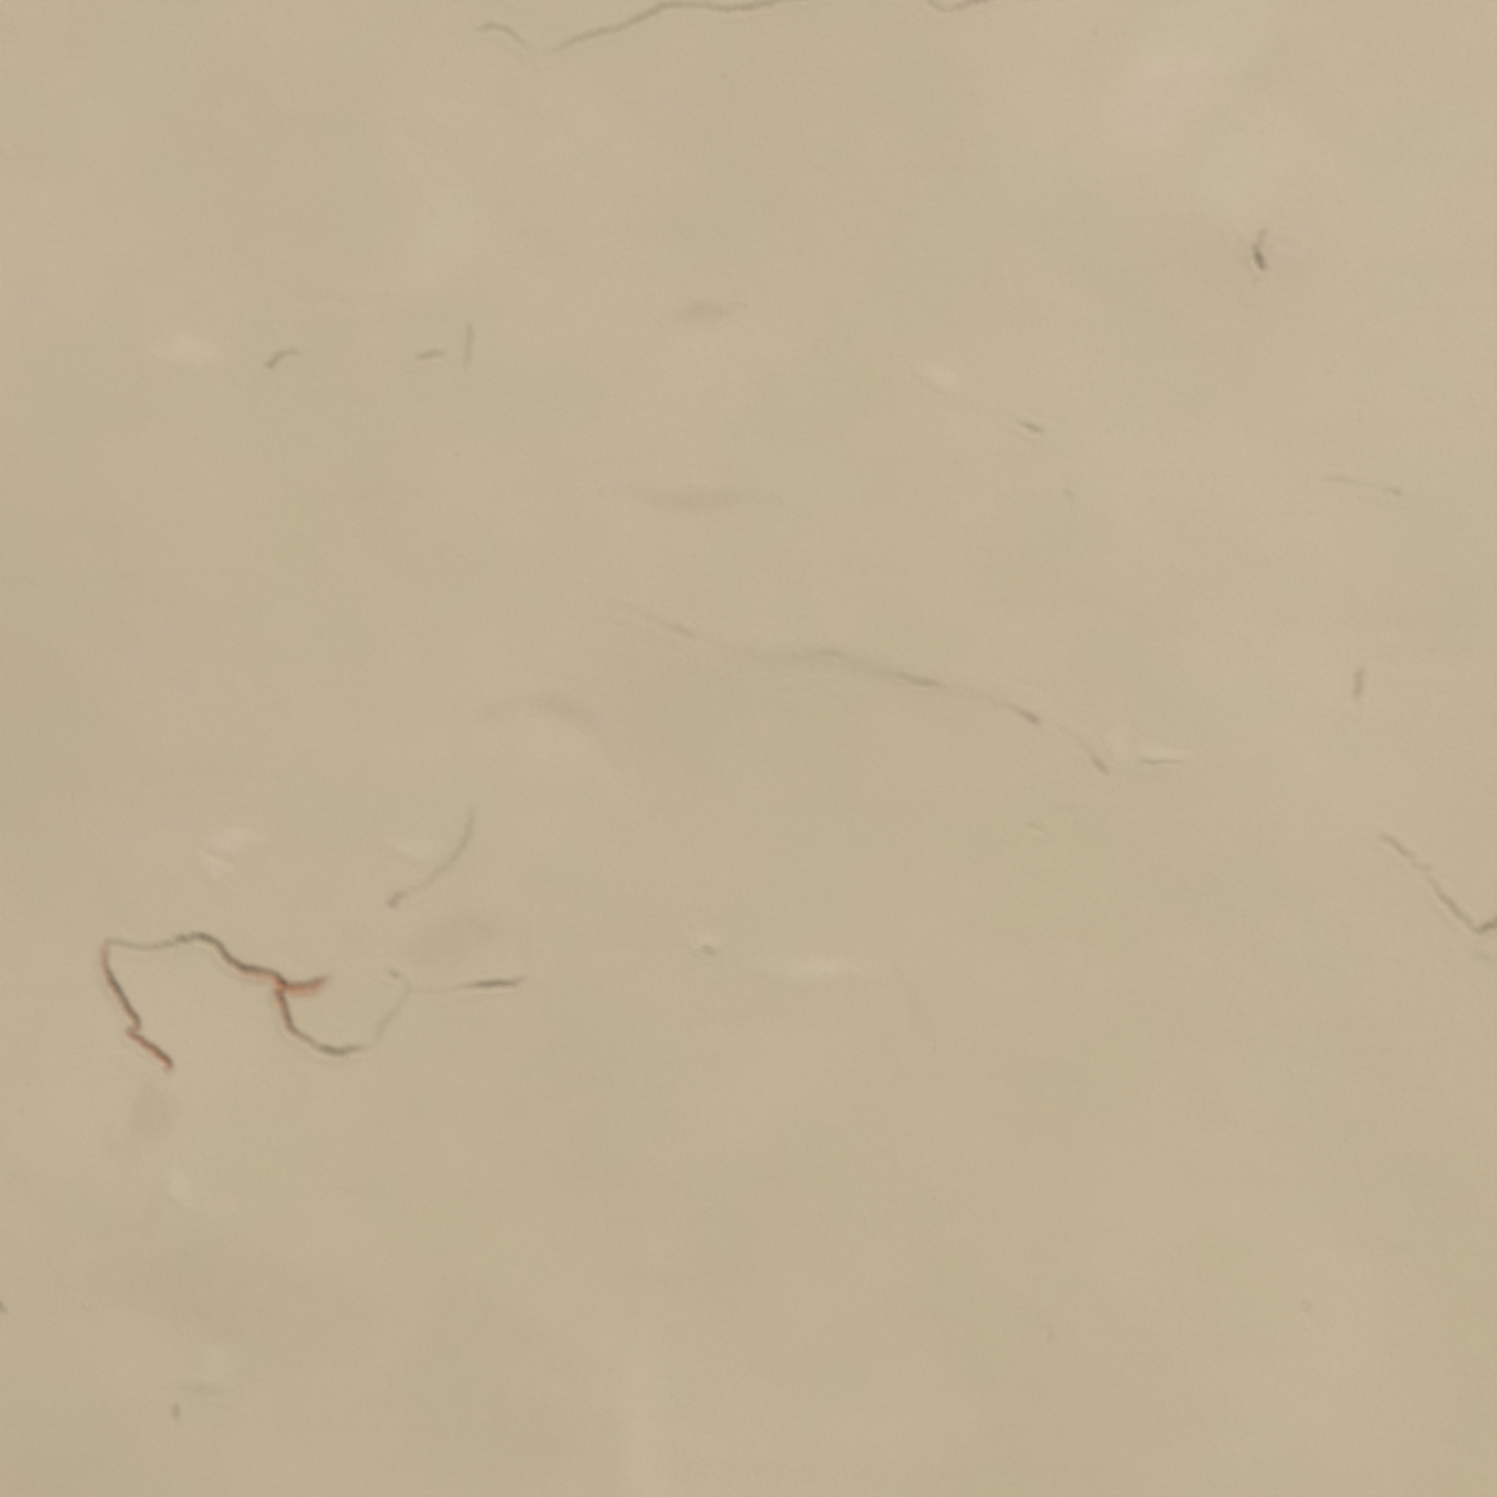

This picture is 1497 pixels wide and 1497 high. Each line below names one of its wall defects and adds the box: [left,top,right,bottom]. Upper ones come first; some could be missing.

crack [90,924,546,1095]